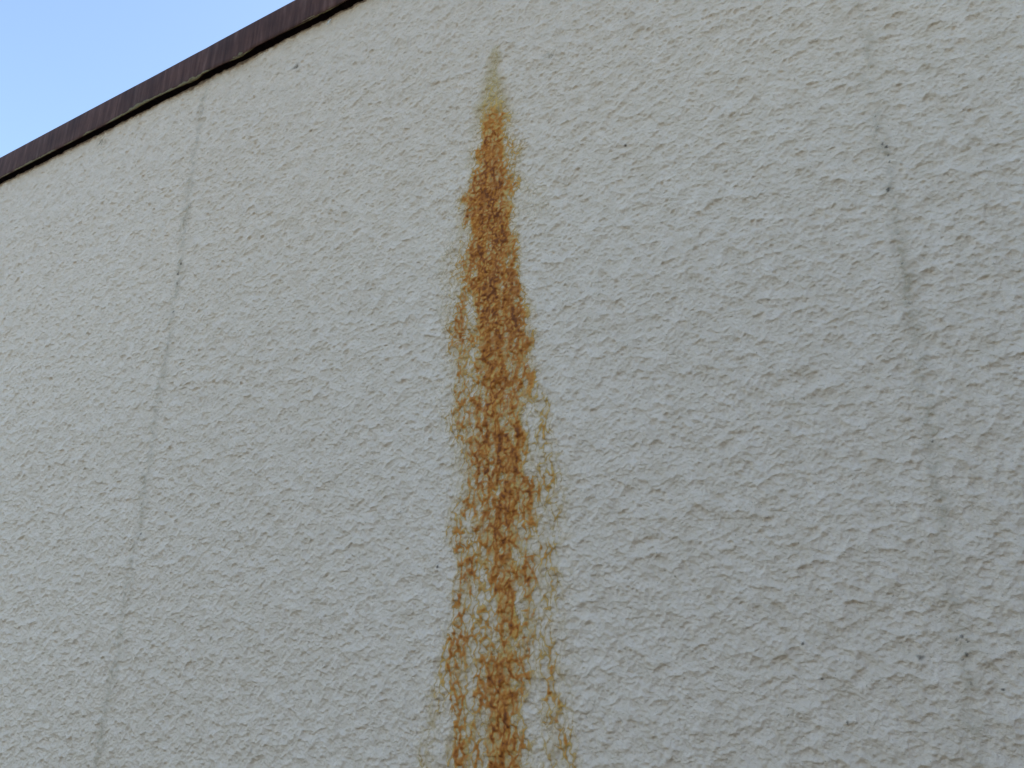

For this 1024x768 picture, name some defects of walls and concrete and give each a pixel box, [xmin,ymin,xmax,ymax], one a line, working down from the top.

rust [433,52,576,768]